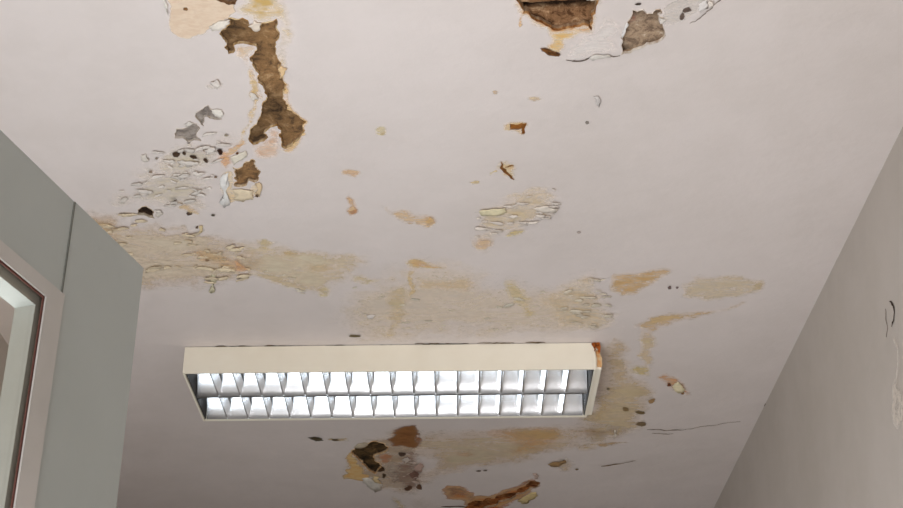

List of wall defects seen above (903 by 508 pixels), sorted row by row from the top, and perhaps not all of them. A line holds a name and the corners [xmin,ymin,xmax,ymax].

flaking render [516,0,721,62]
flaking render [99,0,307,293]
peeling [474,189,562,249]
water stain [613,271,668,294]
water stain [584,312,709,448]
flaking render [343,425,424,492]